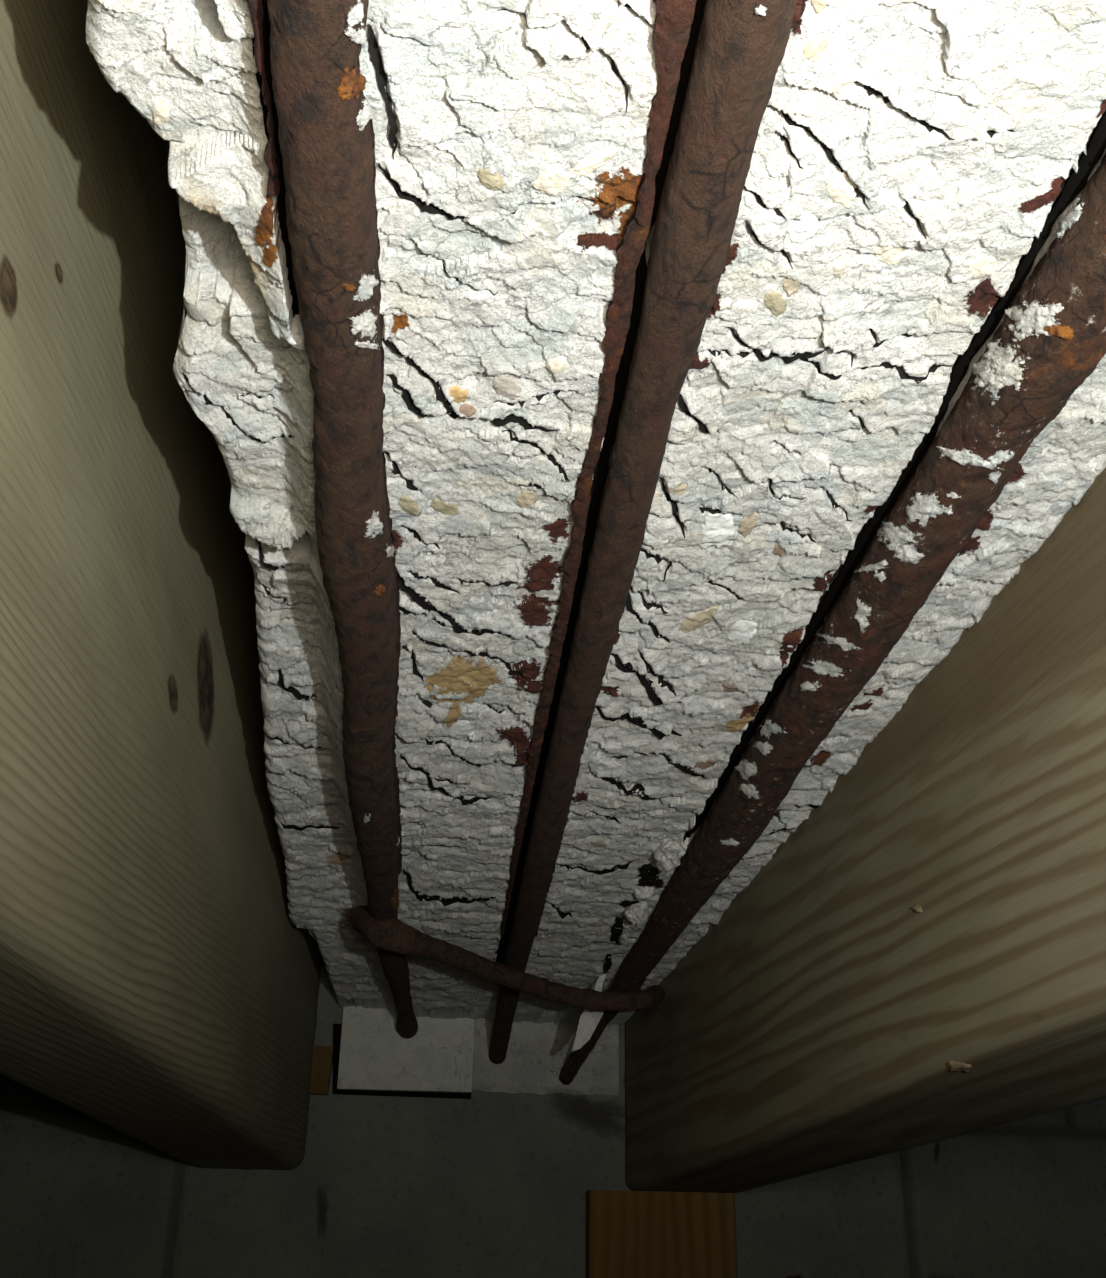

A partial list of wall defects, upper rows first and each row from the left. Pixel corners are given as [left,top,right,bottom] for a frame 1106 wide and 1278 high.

crack [854,81,955,140]
rust [254,194,282,268]
crack [252,0,299,318]
rust [577,166,643,253]
rust [1019,177,1065,213]
rust [964,276,1007,320]
crack [179,369,295,443]
crack [368,0,706,964]
crack [573,106,1106,844]
rust [513,516,570,629]
spalling [86,0,1106,1064]
spalling [559,1011,635,1085]